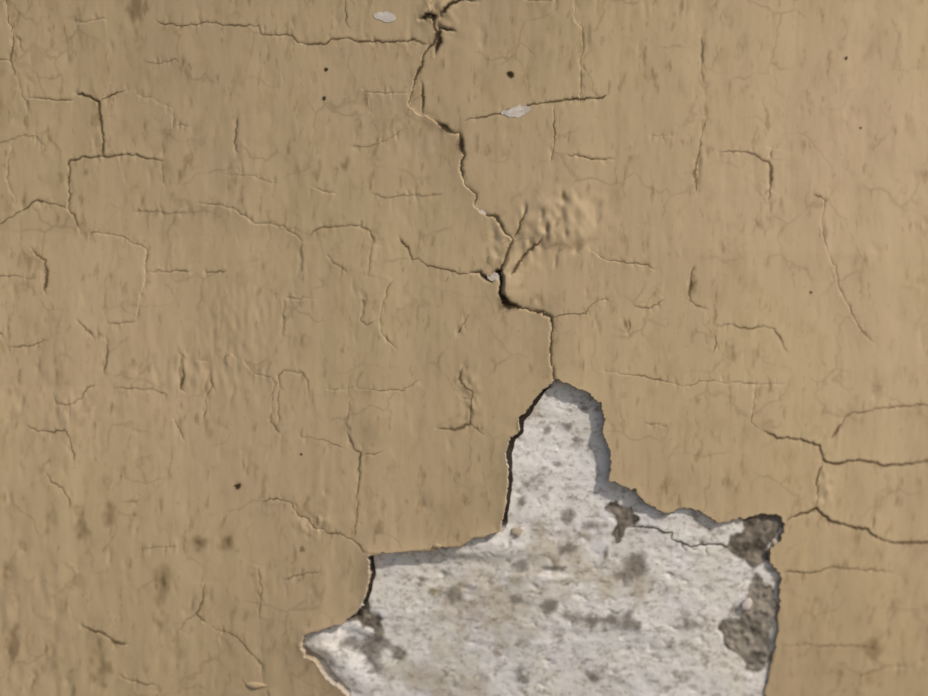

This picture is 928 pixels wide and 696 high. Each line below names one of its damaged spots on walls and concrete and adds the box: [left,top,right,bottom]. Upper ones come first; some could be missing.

crack [478,75,605,155]
crack [0,91,164,225]
crack [161,0,572,382]
crack [724,151,772,195]
crack [37,255,48,289]
crack [444,372,473,430]
crack [271,429,362,549]
crack [751,414,928,544]
peeling [300,379,785,696]
crack [631,526,727,550]
crack [86,627,122,644]